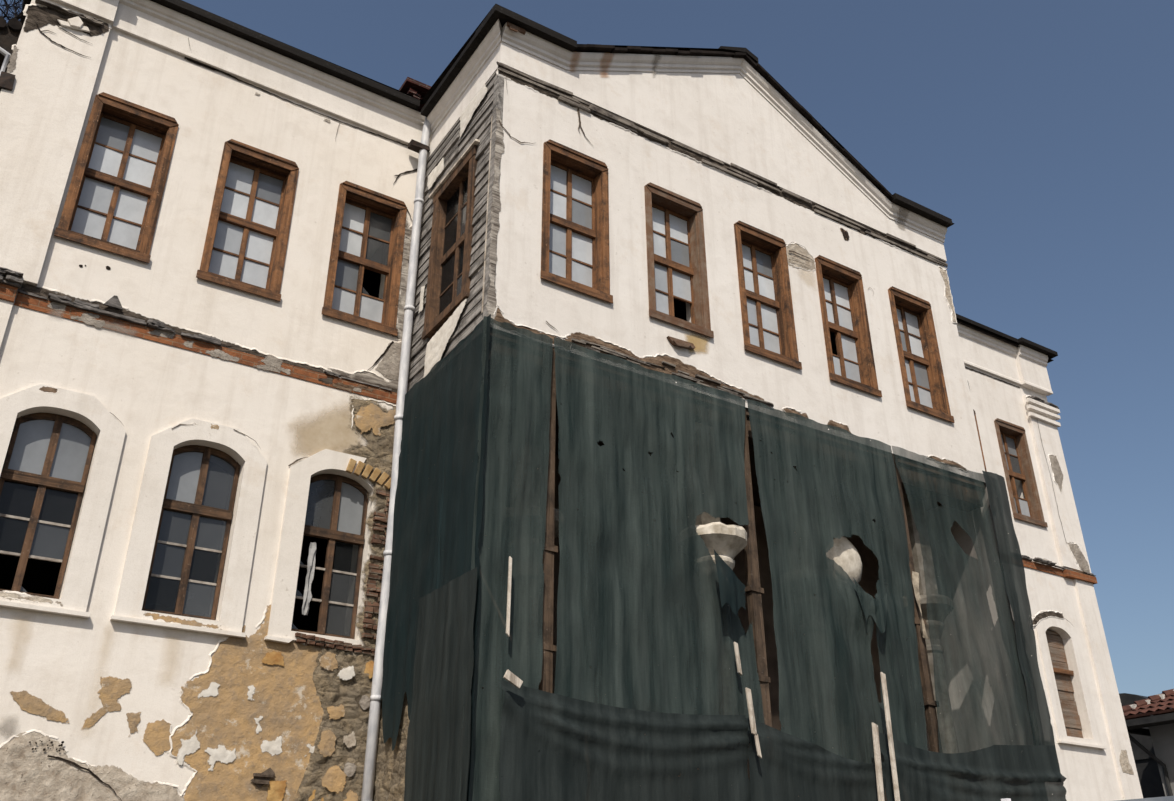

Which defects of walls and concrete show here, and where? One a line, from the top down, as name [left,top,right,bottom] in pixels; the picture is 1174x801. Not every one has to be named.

flaking render [23,0,112,36]
flaking render [7,44,20,73]
crack [577,108,590,142]
flaking render [496,61,957,324]
flaking render [486,108,810,419]
water stain [297,407,360,455]
flaking render [1048,454,1063,494]
peeling [0,214,412,801]